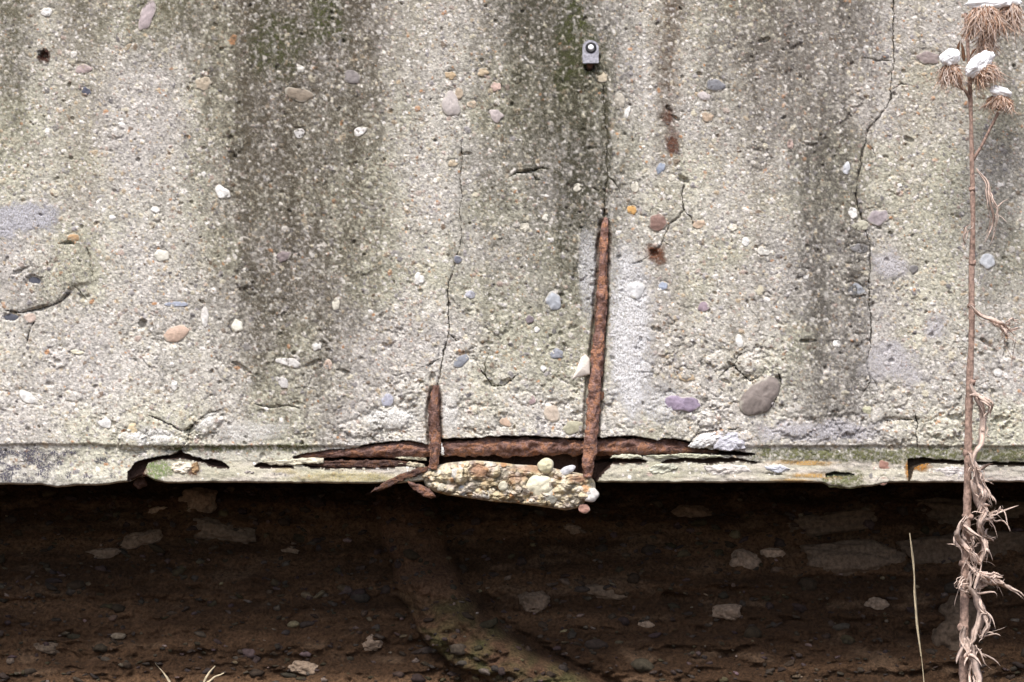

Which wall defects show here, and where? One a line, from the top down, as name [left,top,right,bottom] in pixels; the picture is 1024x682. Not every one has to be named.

leakage [200,0,371,373]
crack [421,145,463,386]
spalling [244,217,790,499]
leakage [484,0,612,316]
leakage [609,245,673,420]
corrosion [648,244,665,264]
crack [629,183,693,266]
corrosion [664,110,679,153]
crack [855,0,909,398]
spalling [127,450,229,481]
spalling [908,457,1024,482]